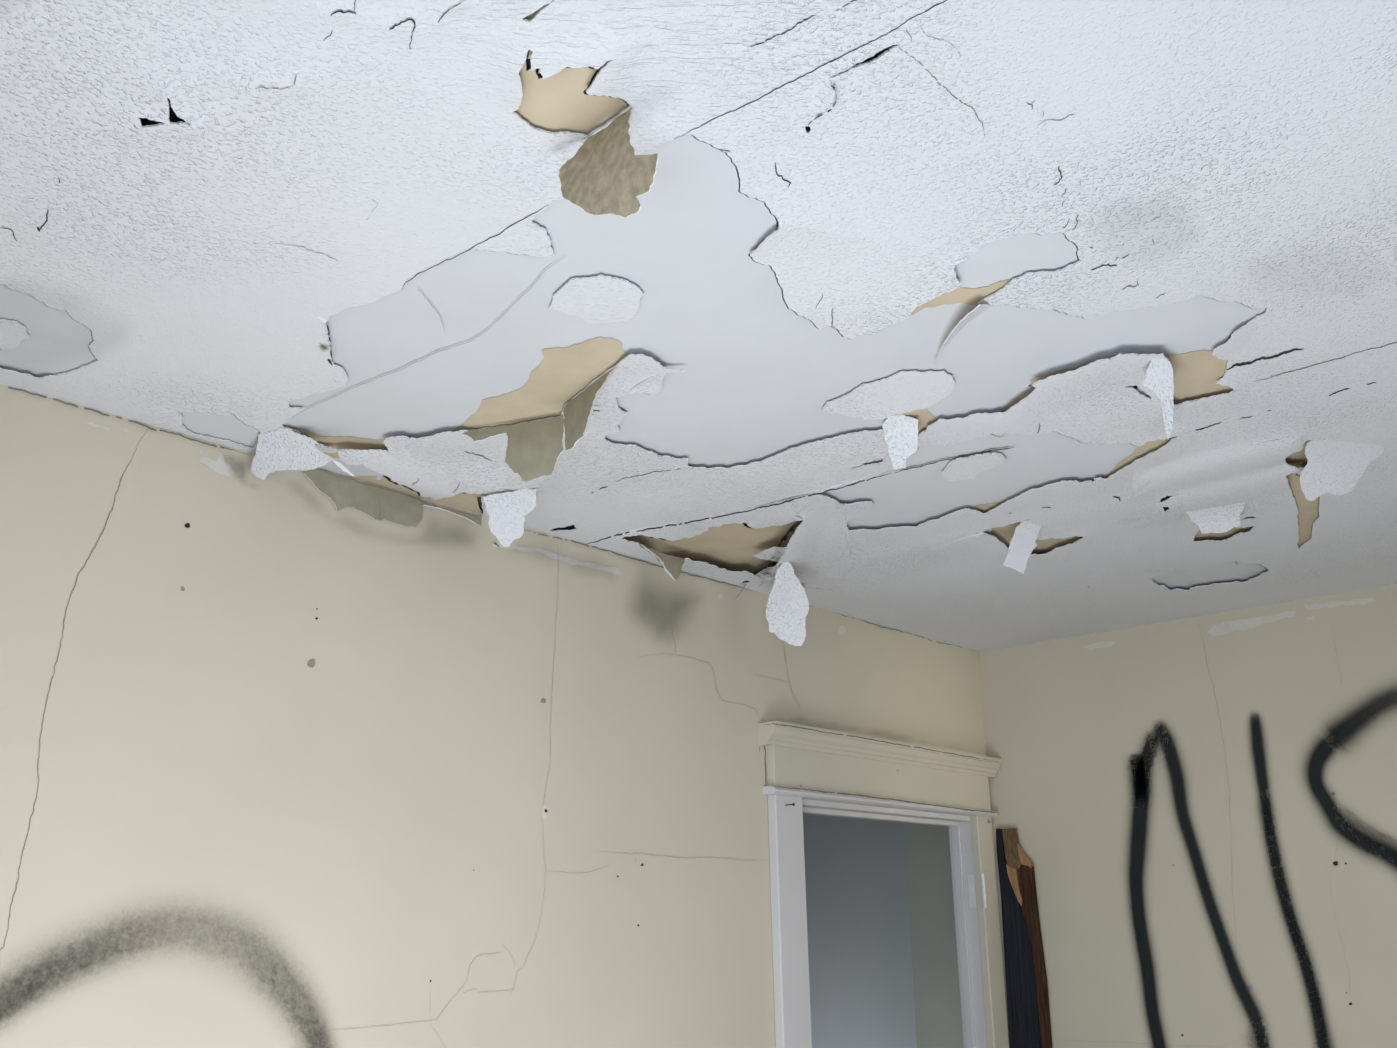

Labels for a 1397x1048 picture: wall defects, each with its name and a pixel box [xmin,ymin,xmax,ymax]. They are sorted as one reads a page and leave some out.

crack [675,0,985,152]
peeling [0,284,96,377]
crack [291,205,566,418]
peeling [281,135,1268,590]
crack [1196,342,1397,431]
peeling [198,449,235,477]
peeling [1285,440,1319,548]
crack [0,387,245,950]
peeling [1207,598,1376,636]